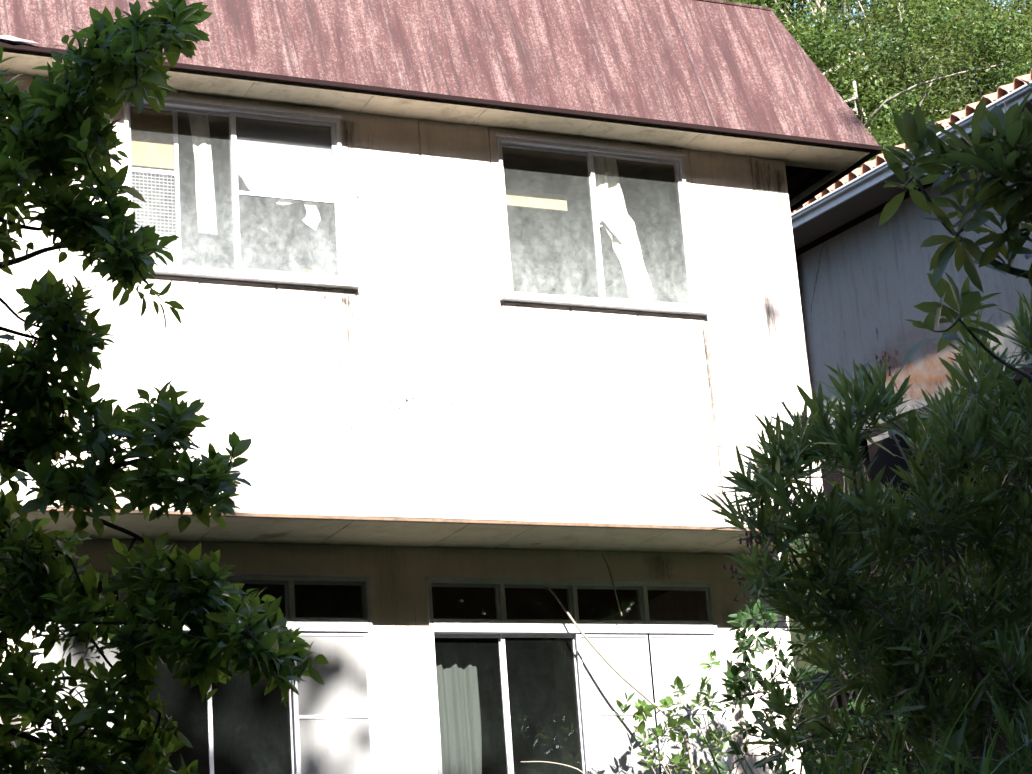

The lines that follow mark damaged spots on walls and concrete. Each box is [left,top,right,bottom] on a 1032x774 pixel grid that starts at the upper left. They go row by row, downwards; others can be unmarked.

leakage [702,326,716,441]